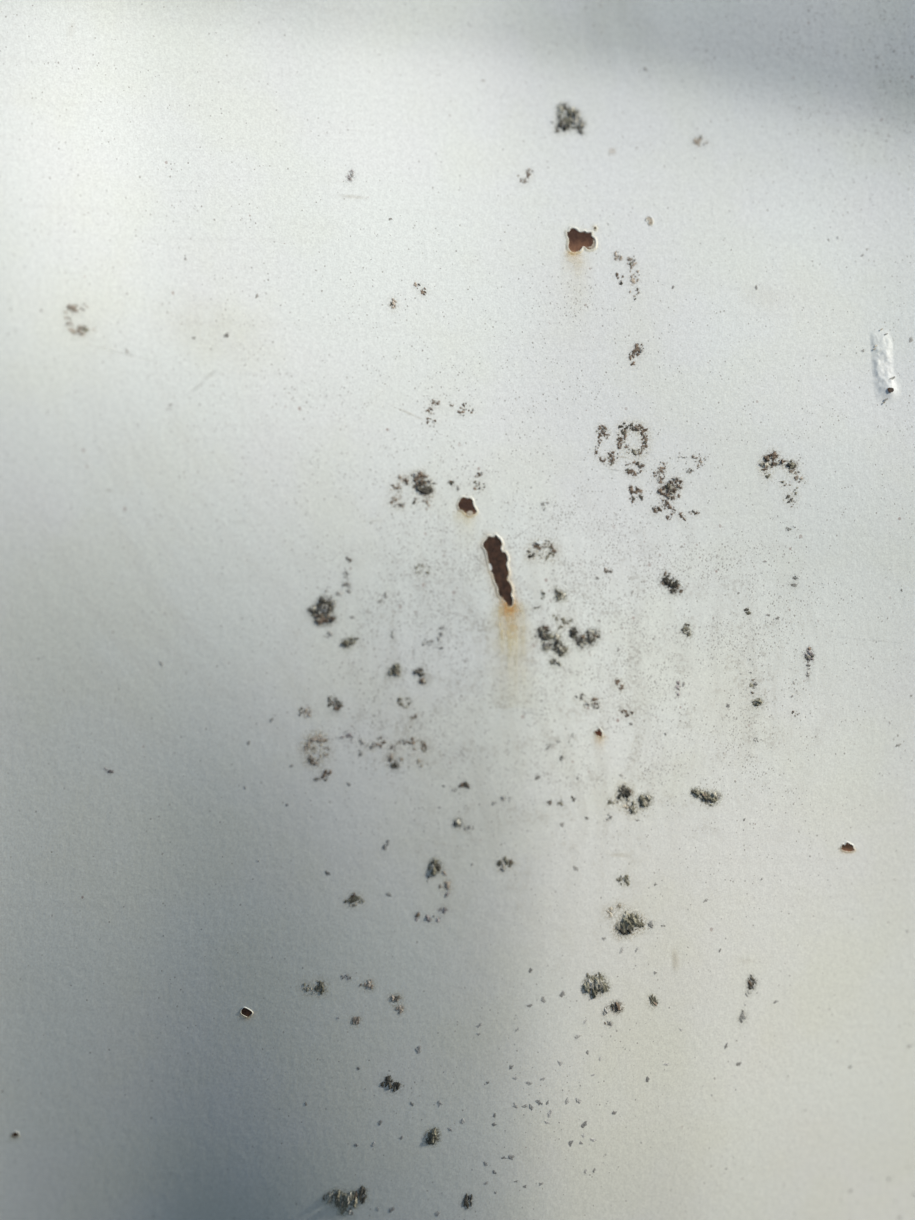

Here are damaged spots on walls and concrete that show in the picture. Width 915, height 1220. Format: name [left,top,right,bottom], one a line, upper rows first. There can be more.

rust [480,533,517,649]